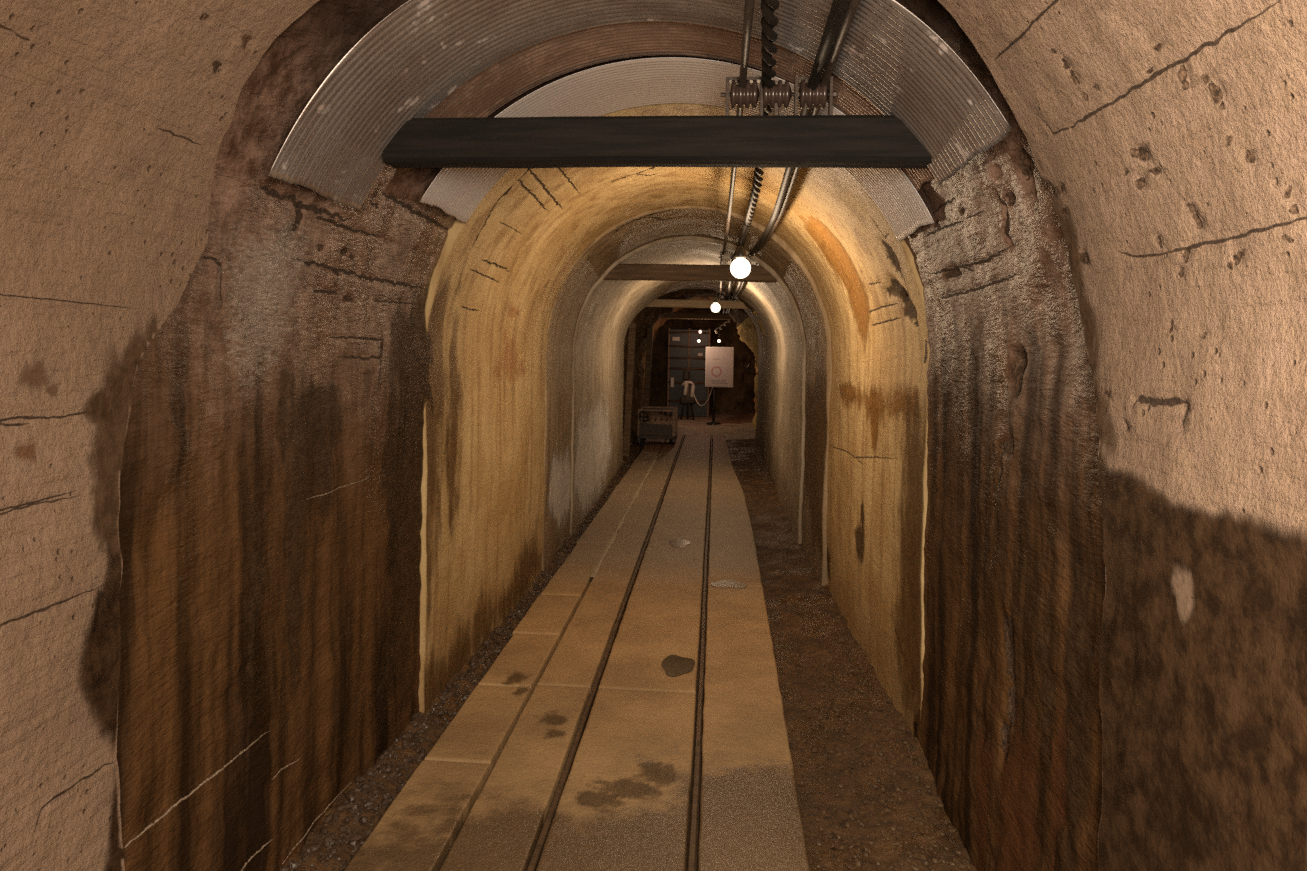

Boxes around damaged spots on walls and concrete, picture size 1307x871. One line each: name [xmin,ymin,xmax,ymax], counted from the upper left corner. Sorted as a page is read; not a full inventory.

crack [995,0,1058,59]
crack [1042,0,1280,134]
crack [1118,216,1307,257]
crack [0,411,85,426]
crack [1133,395,1189,425]
crack [0,490,81,515]
leakage [81,321,157,742]
leakage [804,363,830,576]
leakage [841,382,926,722]
leakage [1036,198,1307,871]
leakage [578,762,676,807]
leakage [106,790,125,871]